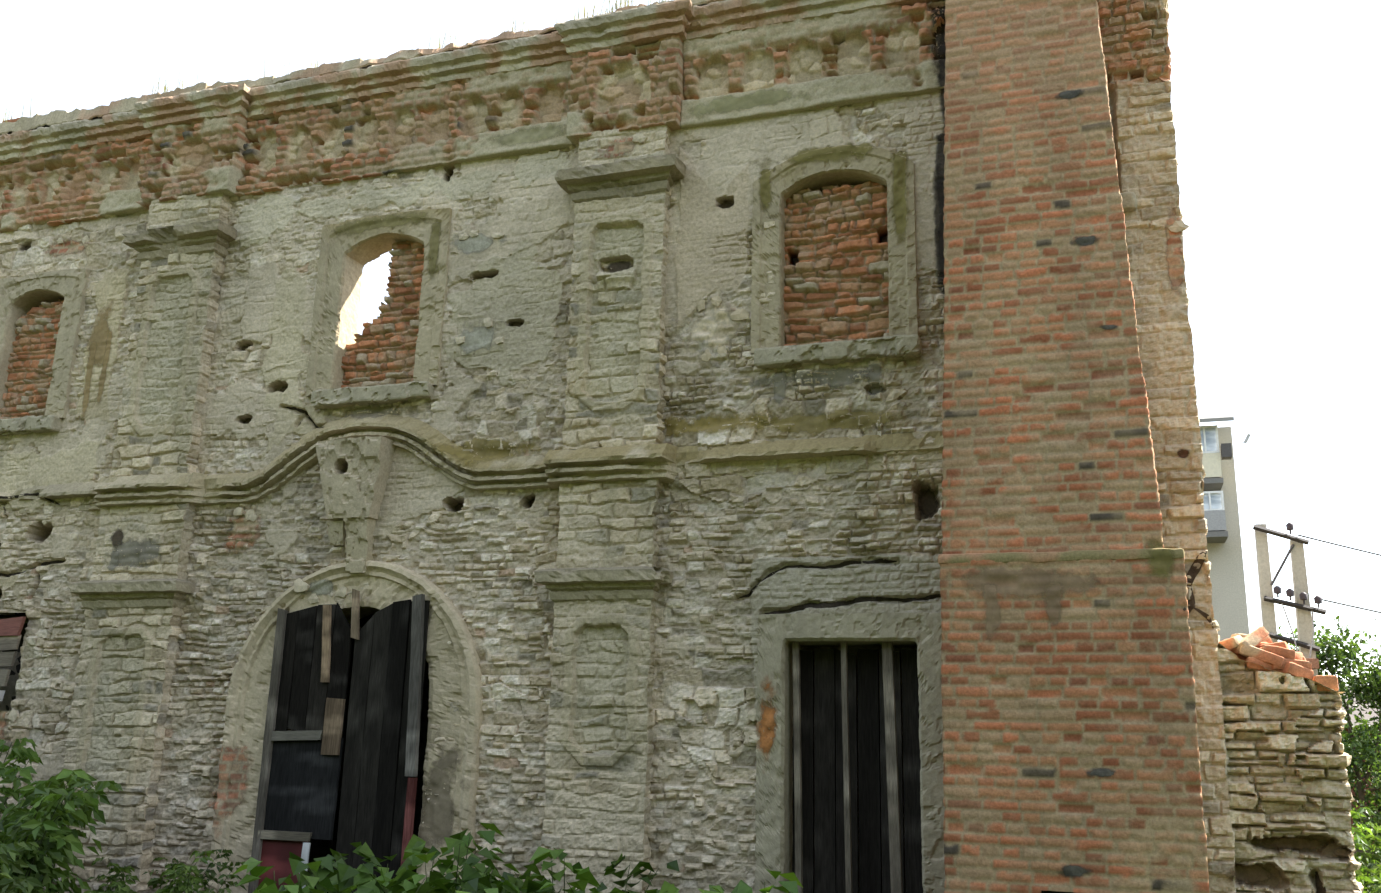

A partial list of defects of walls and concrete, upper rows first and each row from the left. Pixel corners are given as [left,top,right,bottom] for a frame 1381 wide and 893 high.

spalling [604,133,647,158]
leakage [759,169,771,208]
leakage [892,152,908,242]
leakage [82,308,112,417]
spalling [206,746,248,835]